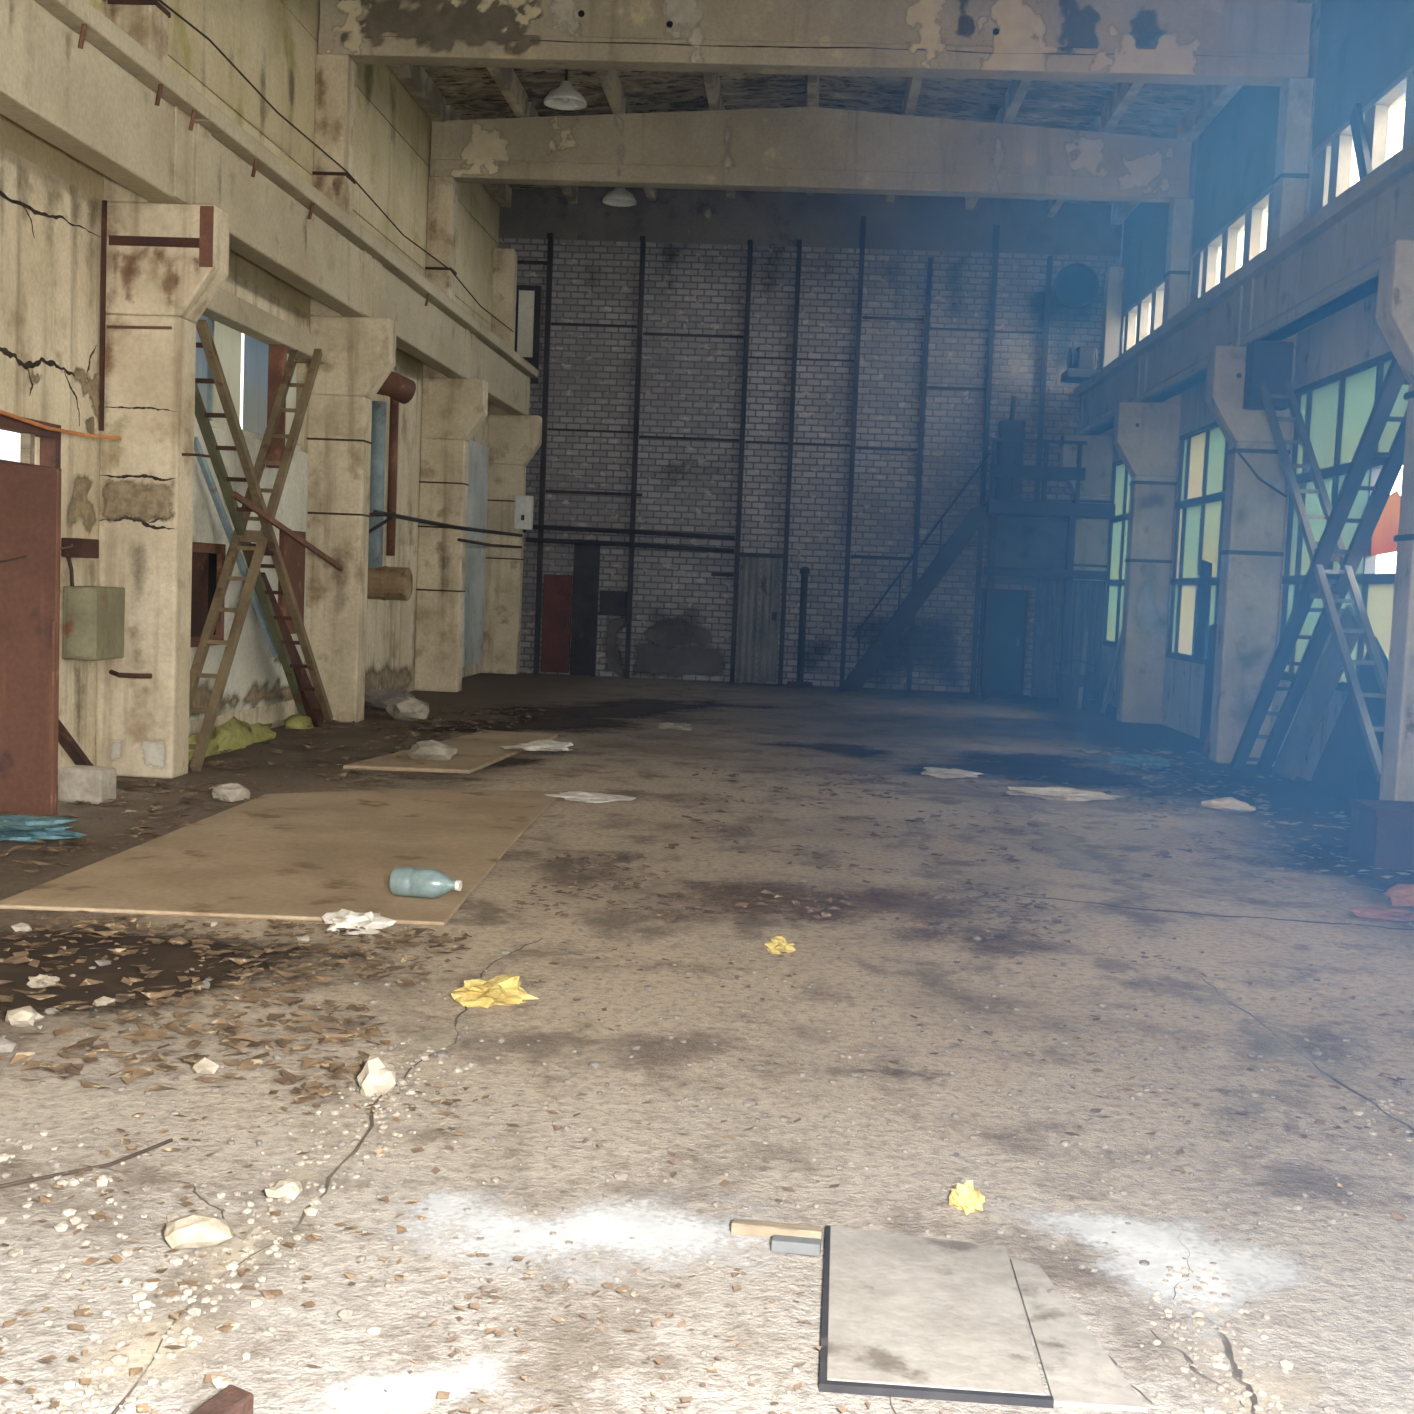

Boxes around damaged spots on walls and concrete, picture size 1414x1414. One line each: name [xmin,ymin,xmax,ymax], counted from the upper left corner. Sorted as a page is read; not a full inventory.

peeling [326,0,542,55]
peeling [905,0,1201,75]
crack [0,190,100,238]
crack [0,345,177,426]
crack [1202,978,1414,1132]
crack [79,938,543,1414]
crack [1151,1219,1258,1414]
crack [1107,1354,1152,1403]